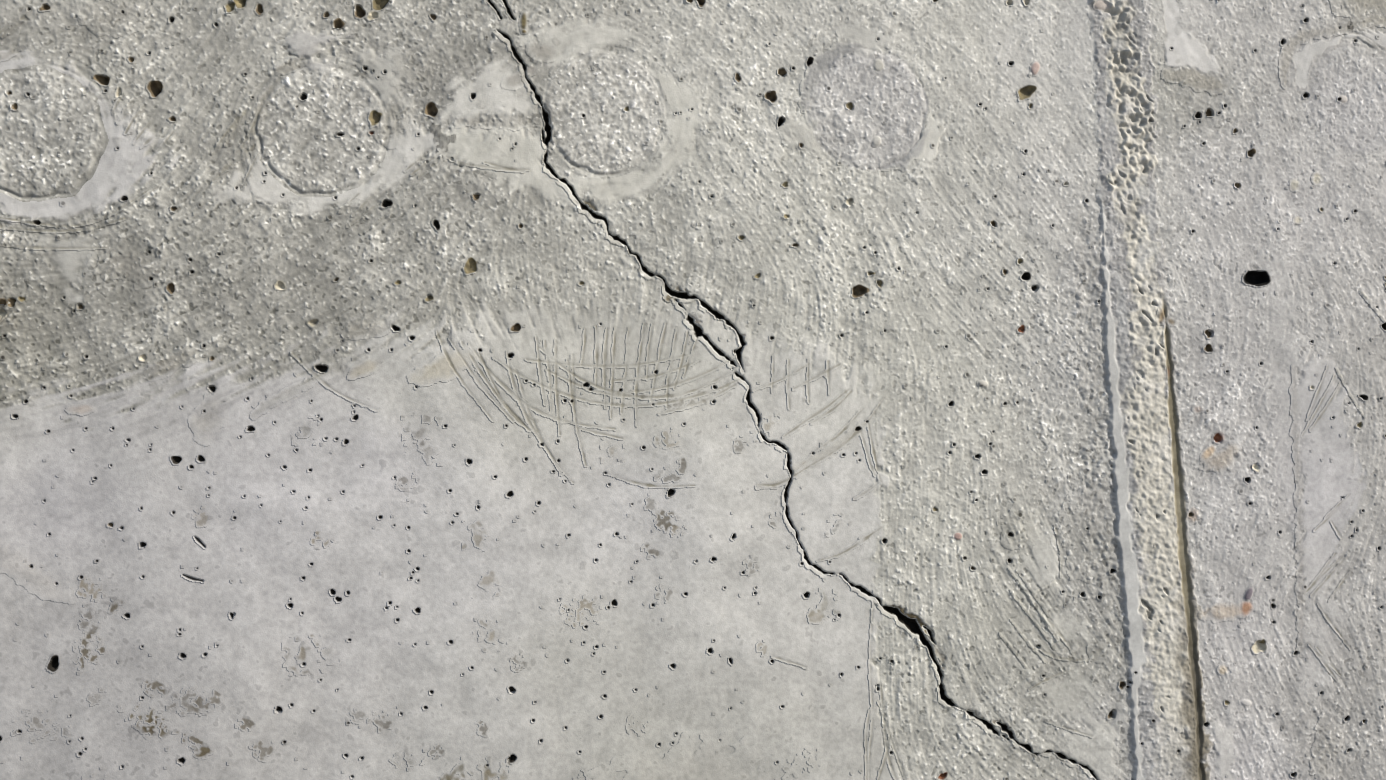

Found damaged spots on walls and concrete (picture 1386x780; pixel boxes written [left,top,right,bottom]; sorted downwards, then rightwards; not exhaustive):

crack [487,0,1100,780]